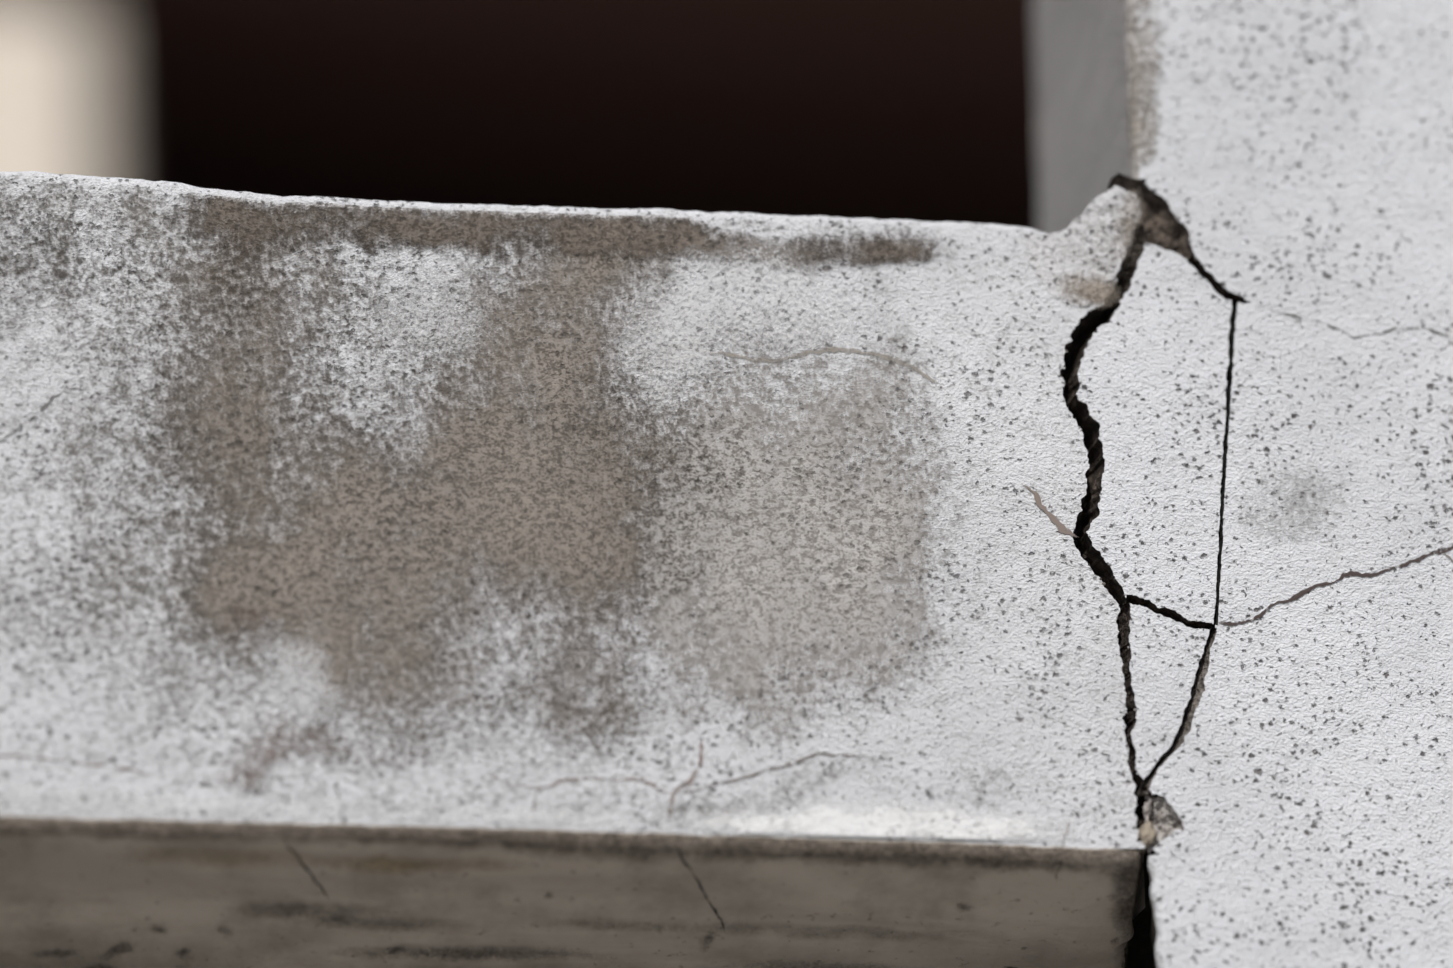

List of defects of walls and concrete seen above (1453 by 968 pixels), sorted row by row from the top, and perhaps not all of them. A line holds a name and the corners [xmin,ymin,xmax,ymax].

leakage [0,181,951,756]
crack [1022,224,1453,968]